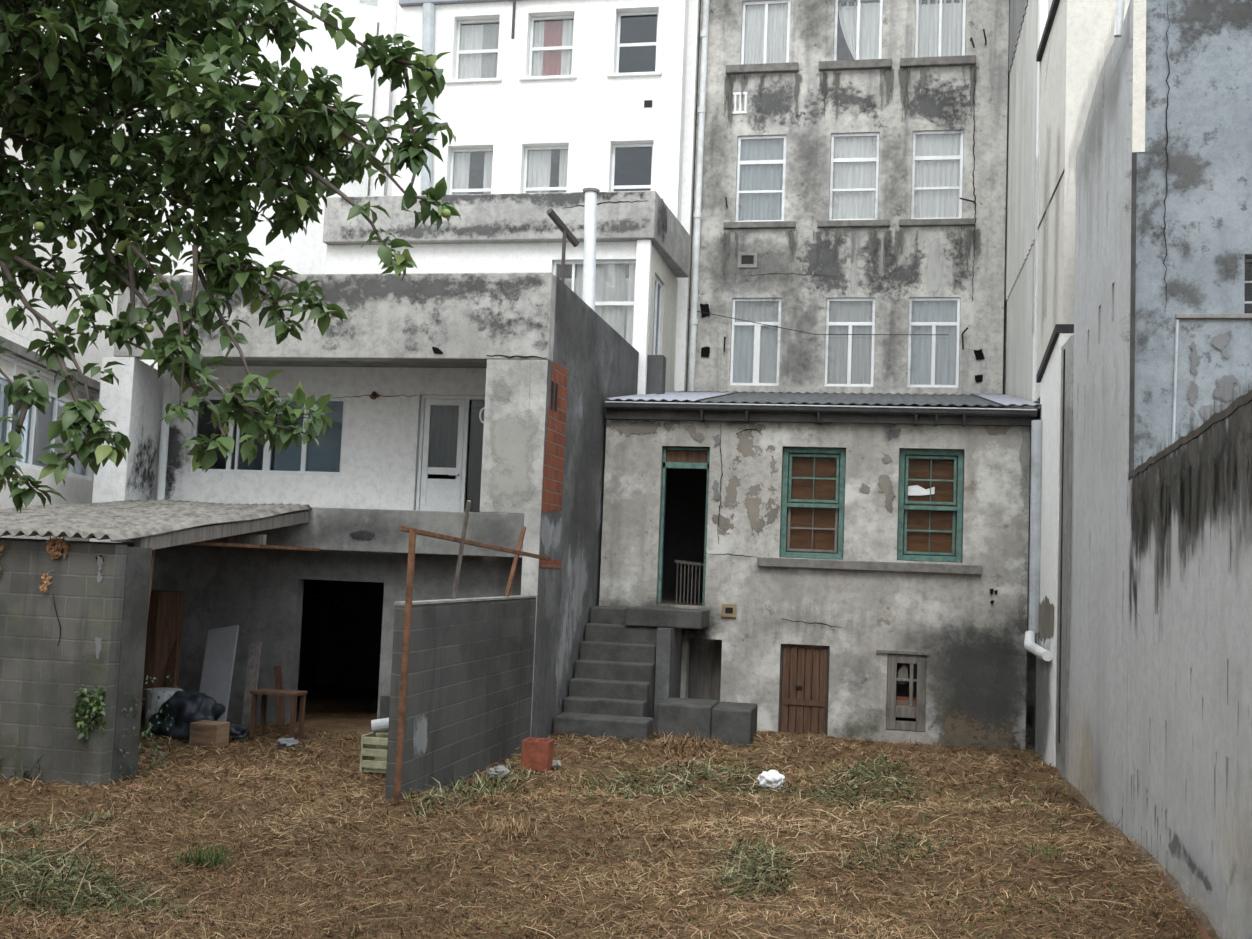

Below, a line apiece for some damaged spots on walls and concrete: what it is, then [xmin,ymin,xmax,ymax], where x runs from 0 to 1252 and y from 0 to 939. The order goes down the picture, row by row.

water stain [713,65,977,172]
crack [1162,7,1170,309]
water stain [135,273,593,350]
water stain [711,228,980,296]
flaking render [542,362,568,513]
flaking render [606,419,721,446]
flaking render [712,422,782,536]
flaking render [859,424,901,512]
water stain [1127,382,1252,628]
water stain [928,620,1049,760]